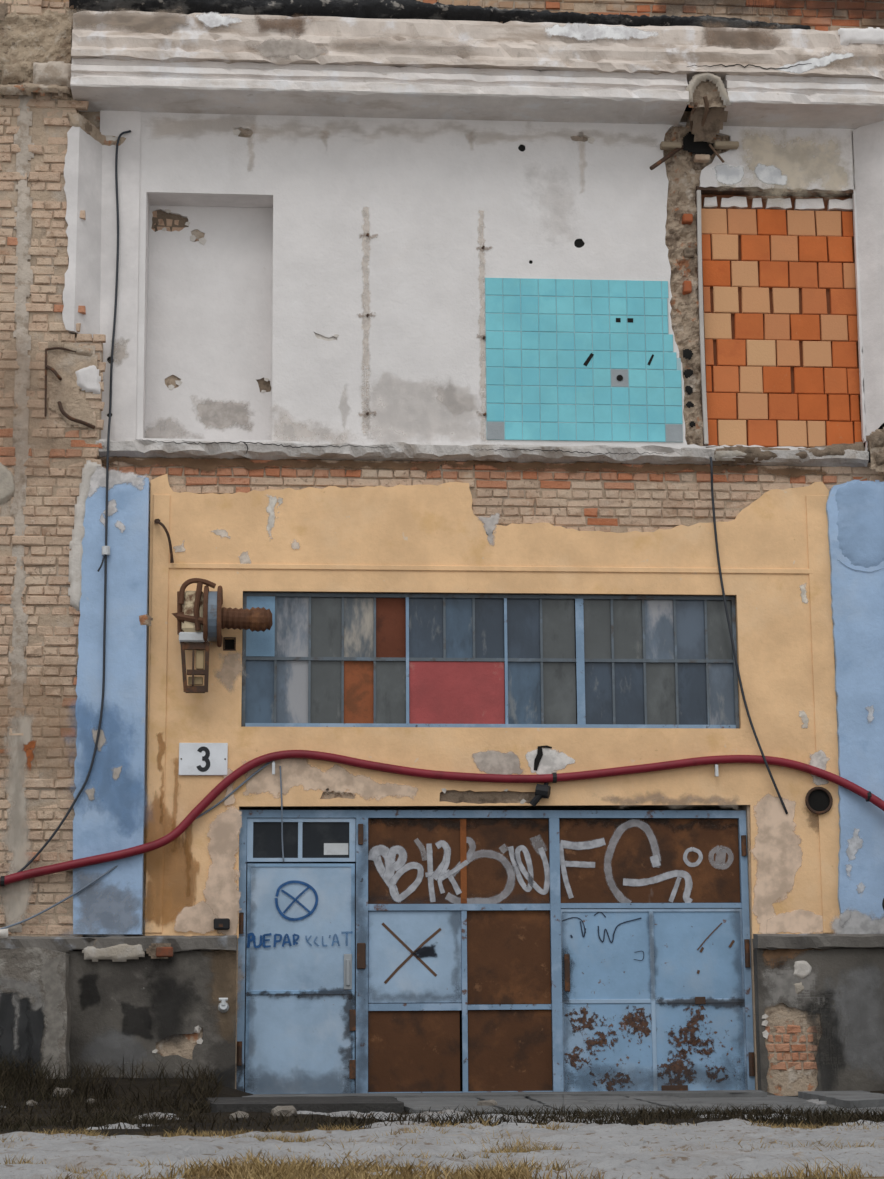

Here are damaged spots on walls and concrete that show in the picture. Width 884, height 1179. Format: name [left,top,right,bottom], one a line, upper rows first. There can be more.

peeling [479,513,499,545]
peeling [92,729,106,751]
spalling [439,788,540,804]
peeling [473,748,575,775]
peeling [82,758,418,962]
peeling [751,794,836,934]
damp [0,978,45,1076]
peeling [40,955,65,1079]
spalling [152,1026,203,1060]
rust [564,1004,652,1091]
rust [657,1005,741,1085]
spalling [762,961,823,1096]